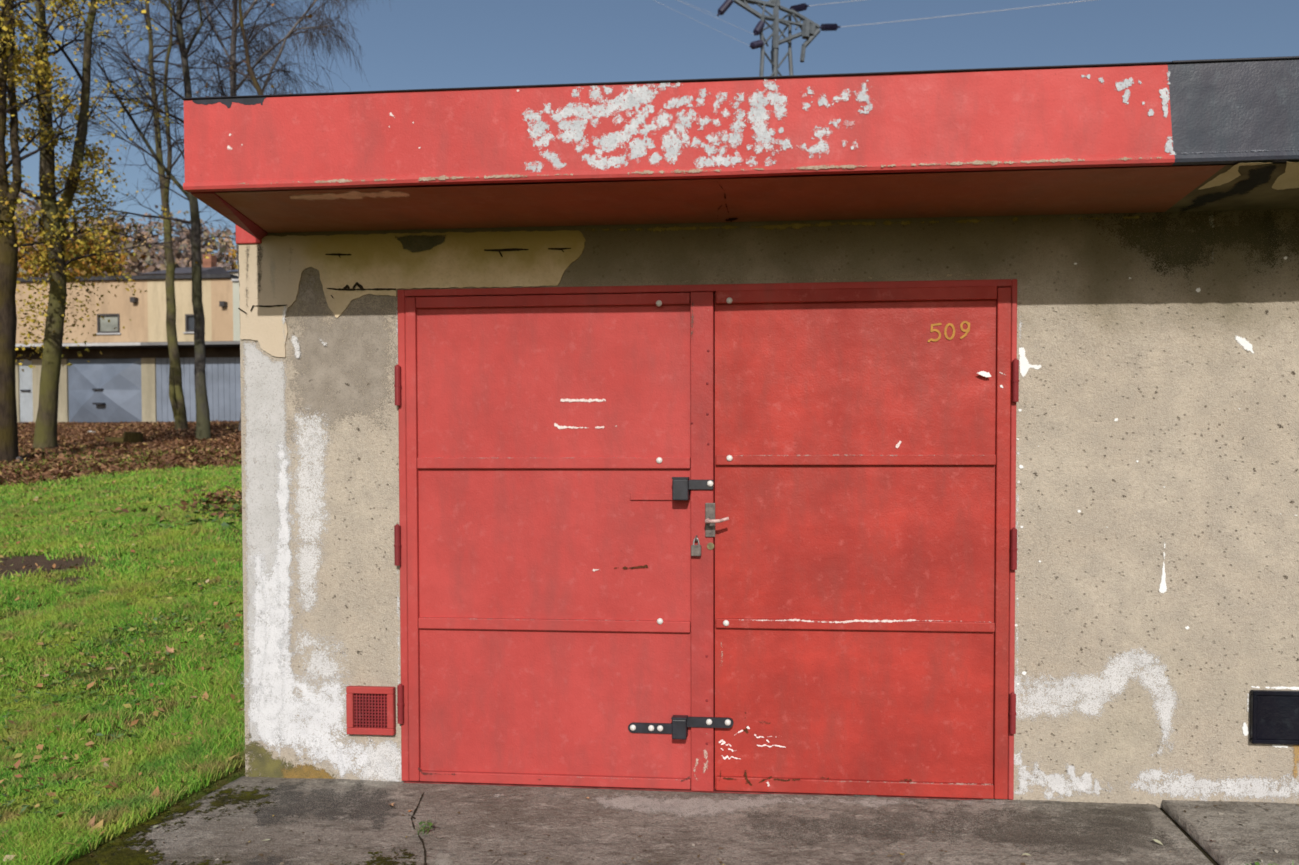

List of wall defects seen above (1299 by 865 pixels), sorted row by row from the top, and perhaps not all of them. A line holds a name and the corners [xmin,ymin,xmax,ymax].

peeling [418,78,1085,181]
peeling [1081,71,1171,117]
peeling [1117,136,1176,161]
water stain [1081,149,1299,295]
water stain [240,405,405,831]
peeling [1015,593,1044,685]
water stain [548,647,1299,865]
crack [389,792,427,865]